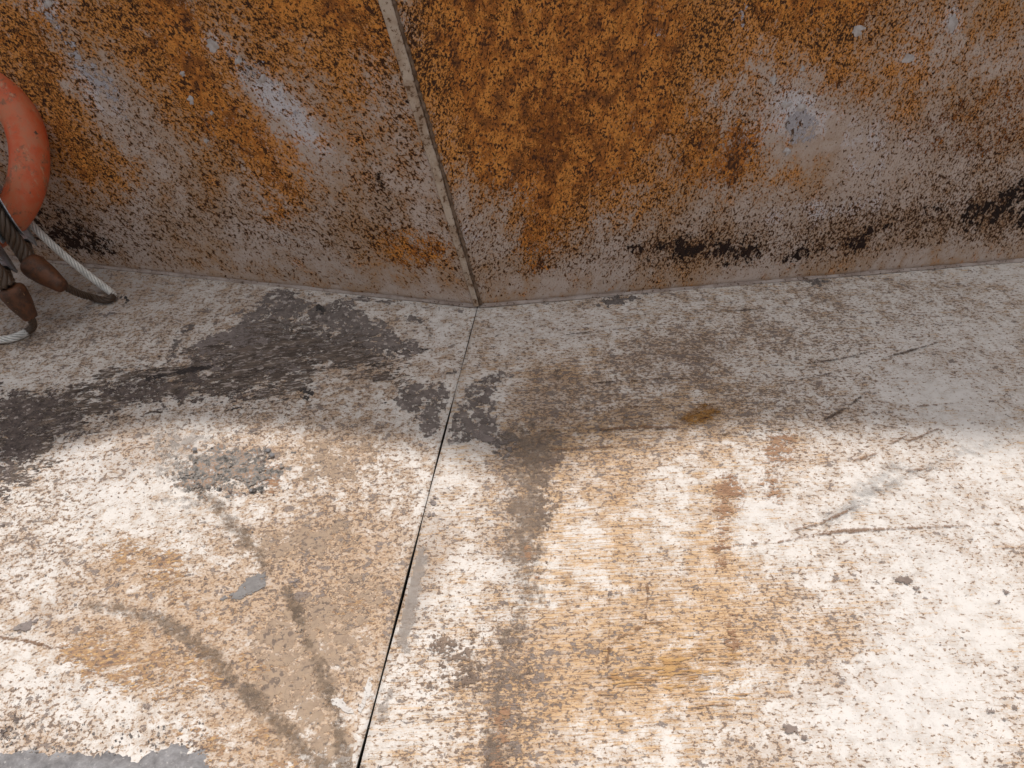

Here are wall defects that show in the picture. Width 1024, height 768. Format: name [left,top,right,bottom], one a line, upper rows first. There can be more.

corrosion [251,0,392,90]
corrosion [749,0,891,46]
corrosion [125,0,303,231]
corrosion [407,0,772,276]
corrosion [904,66,1024,162]
corrosion [32,205,128,258]
corrosion [354,132,457,274]
corrosion [782,178,1024,278]
water stain [155,435,272,508]
corrosion [702,432,803,570]
corrosion [581,586,763,718]